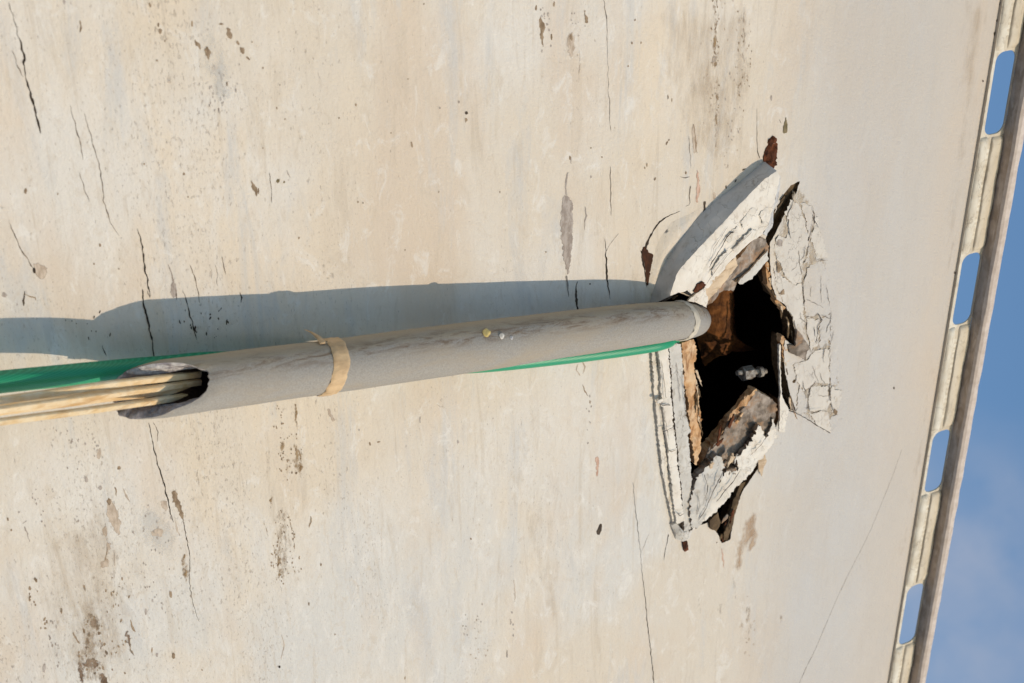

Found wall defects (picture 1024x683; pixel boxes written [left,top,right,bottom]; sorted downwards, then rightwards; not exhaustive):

crack [9,4,41,134]
peeling [689,125,746,212]
peeling [659,287,708,307]
peeling [693,191,842,443]
crack [149,424,198,618]